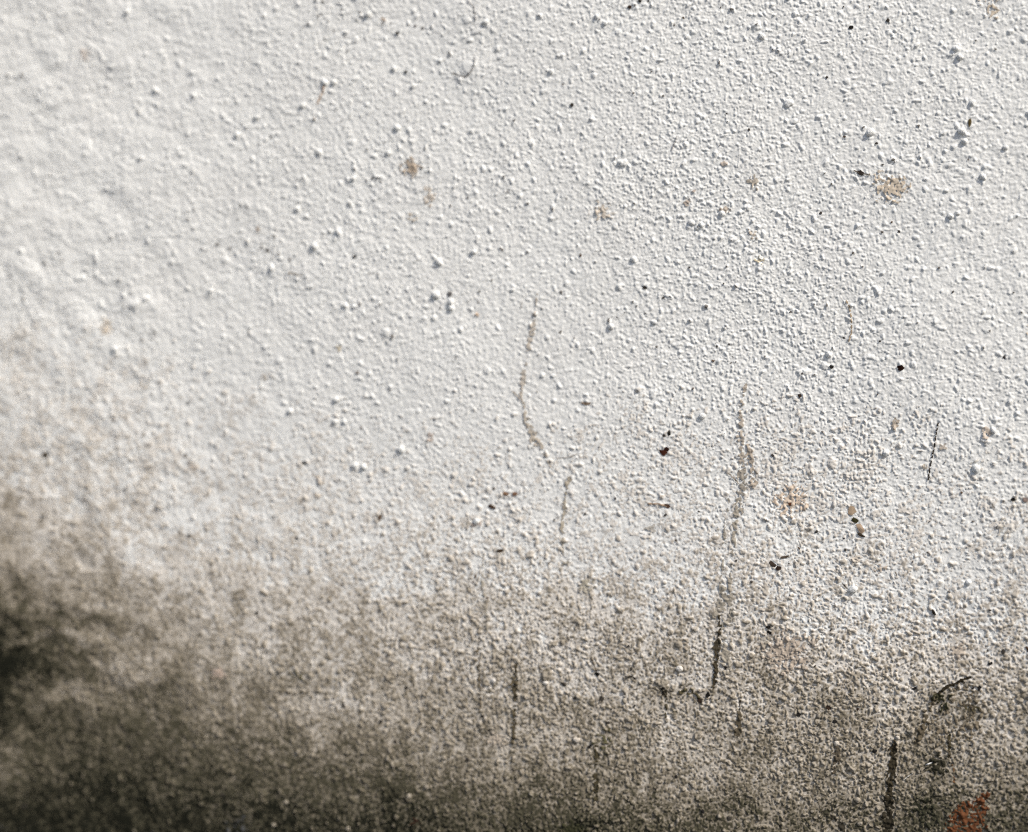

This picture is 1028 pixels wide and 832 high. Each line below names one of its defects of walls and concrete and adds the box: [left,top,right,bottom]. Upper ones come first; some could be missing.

leakage [0,384,1028,832]
corrosion [943,792,990,832]